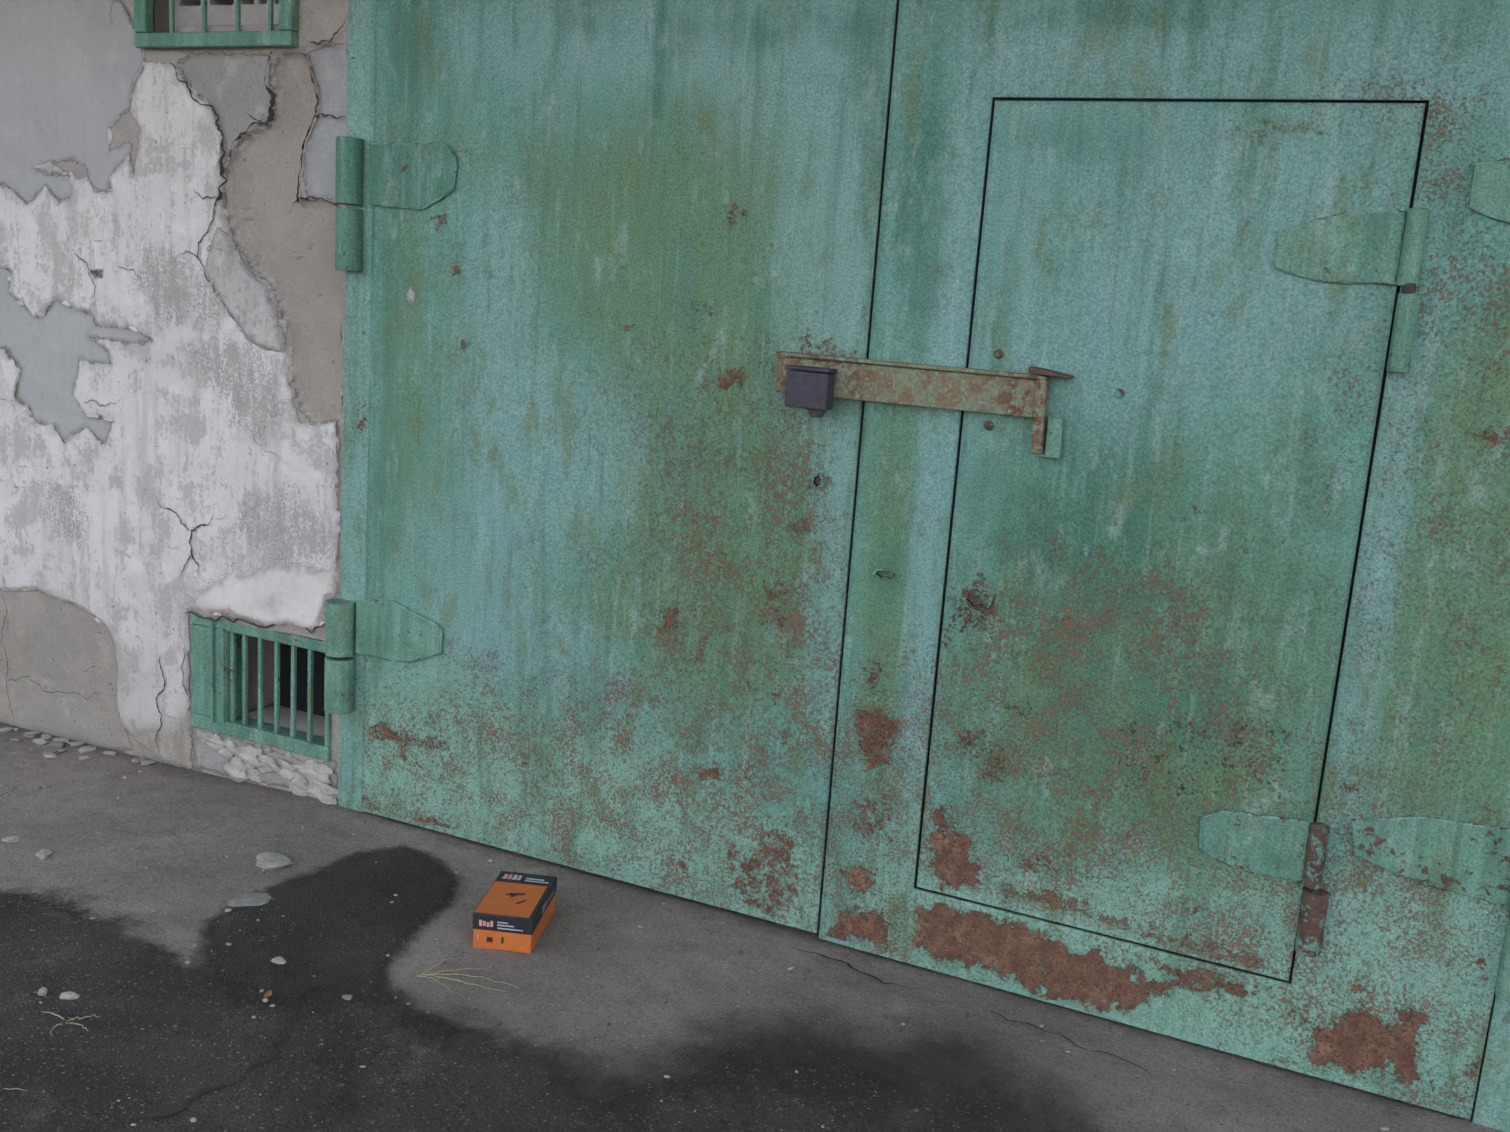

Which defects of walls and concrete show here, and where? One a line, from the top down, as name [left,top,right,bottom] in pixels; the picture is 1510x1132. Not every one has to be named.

crack [75,254,139,307]
peeling [0,0,348,789]
crack [110,0,346,339]
crack [155,498,325,758]
corrosion [826,806,1290,1017]
corrosion [1280,974,1479,1104]